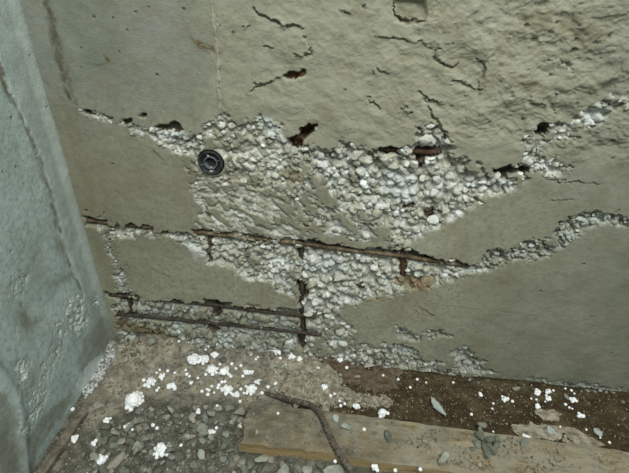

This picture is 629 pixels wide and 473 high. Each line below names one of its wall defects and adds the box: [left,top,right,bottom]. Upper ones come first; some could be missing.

crack [247,6,313,57]
crack [250,80,273,93]
crack [375,36,487,91]
flaking render [122,118,302,189]
crack [419,90,447,139]
spalling [523,122,569,142]
flaking render [289,123,563,242]
flaking render [476,239,553,273]
flaking render [114,260,194,323]
flaking render [172,230,465,368]
corrosion [112,317,172,338]
flaking render [448,346,493,377]